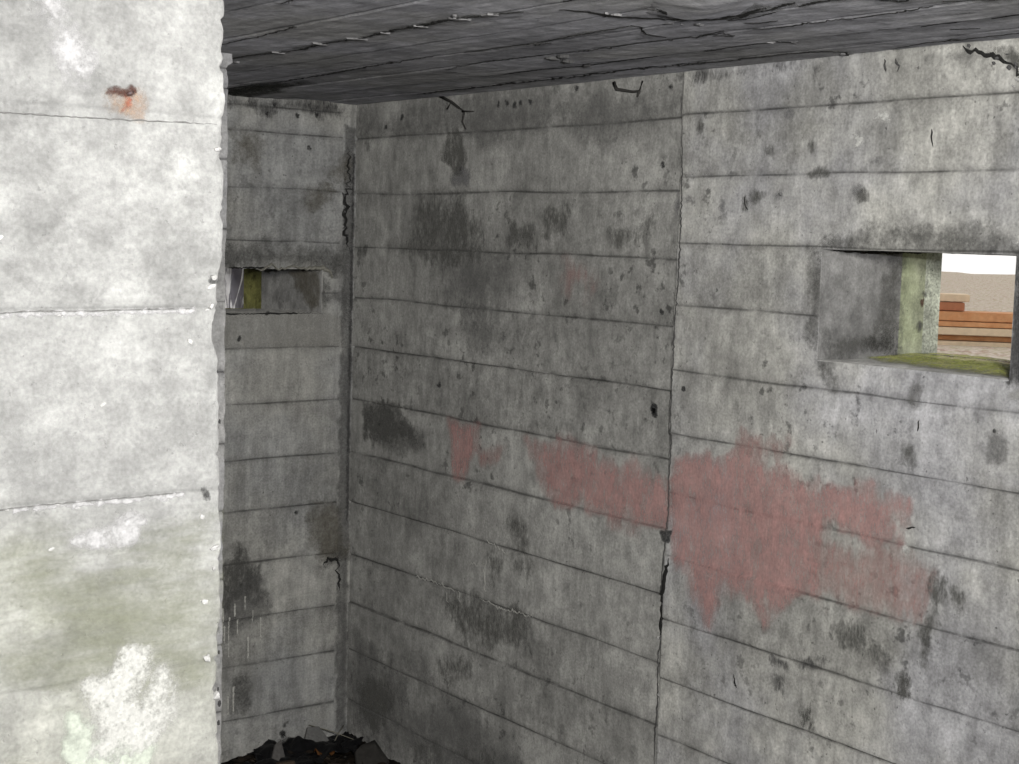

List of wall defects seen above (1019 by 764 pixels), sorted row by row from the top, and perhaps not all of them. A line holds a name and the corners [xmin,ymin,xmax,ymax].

crack [222,0,1019,95]
rust [108,85,139,114]
crack [342,148,352,250]
water stain [225,244,277,267]
water stain [298,125,532,764]
crack [654,96,683,763]
water stain [222,547,268,659]
crack [323,557,341,591]